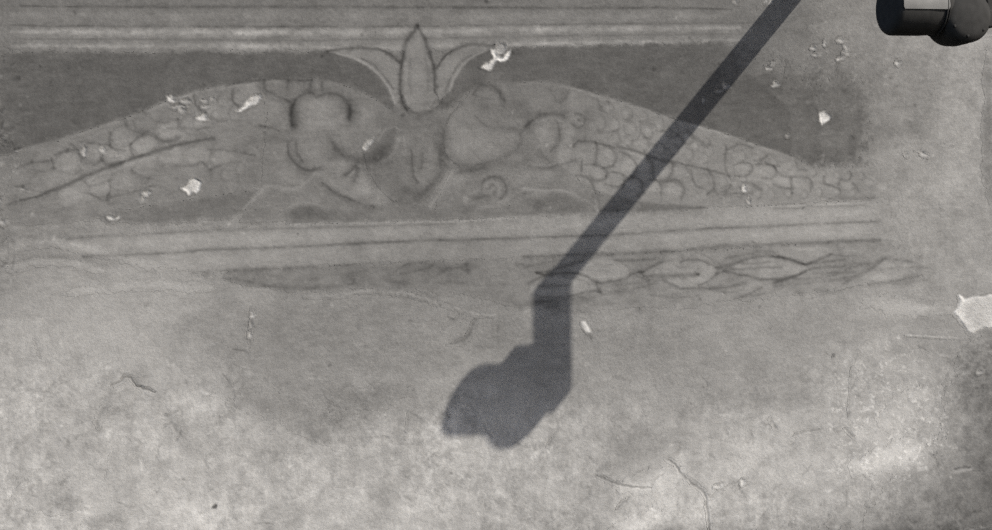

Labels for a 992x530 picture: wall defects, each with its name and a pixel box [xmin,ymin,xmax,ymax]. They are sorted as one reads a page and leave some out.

peeling [479,40,514,73]
peeling [234,93,265,115]
peeling [817,109,833,128]
peeling [180,176,204,197]
crack [596,455,739,530]